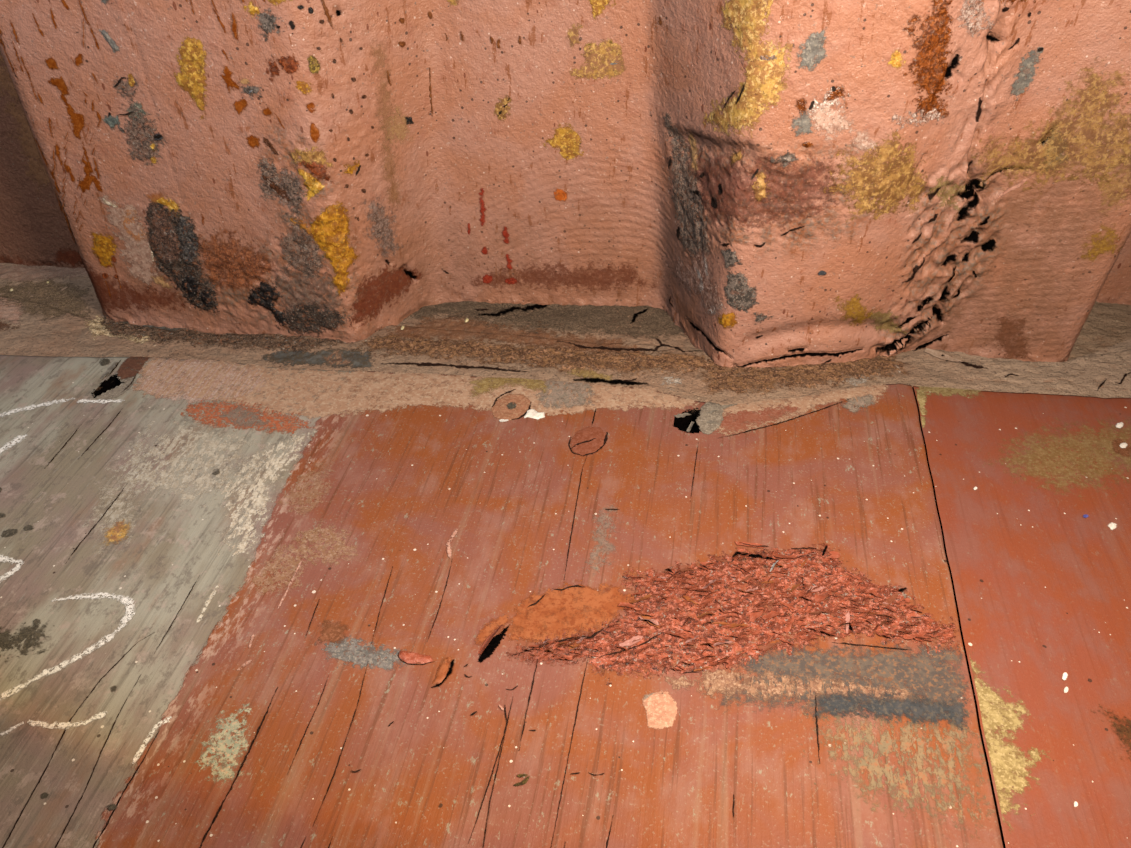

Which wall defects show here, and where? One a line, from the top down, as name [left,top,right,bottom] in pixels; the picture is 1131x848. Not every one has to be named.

crack [987,7,1032,49]
crack [944,54,960,78]
corrosion [823,0,965,222]
corrosion [34,57,121,297]
crack [381,362,528,372]
corrosion [181,398,319,434]
peeling [89,357,699,561]
mould [0,513,34,537]
mould [0,619,46,662]
peeling [315,620,407,671]
peeling [475,539,1045,826]
damp [665,643,994,827]